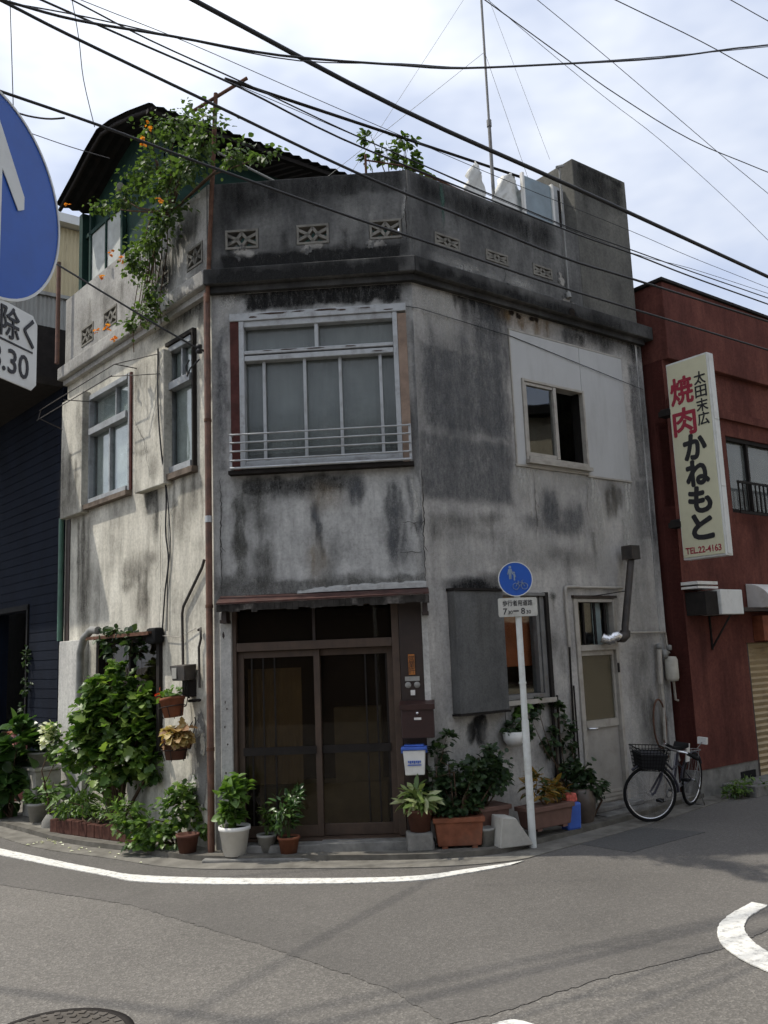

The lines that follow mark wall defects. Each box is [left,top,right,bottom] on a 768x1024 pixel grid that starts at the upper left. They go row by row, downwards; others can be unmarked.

damp [578,163,621,200]
damp [411,263,642,525]
damp [218,474,421,597]